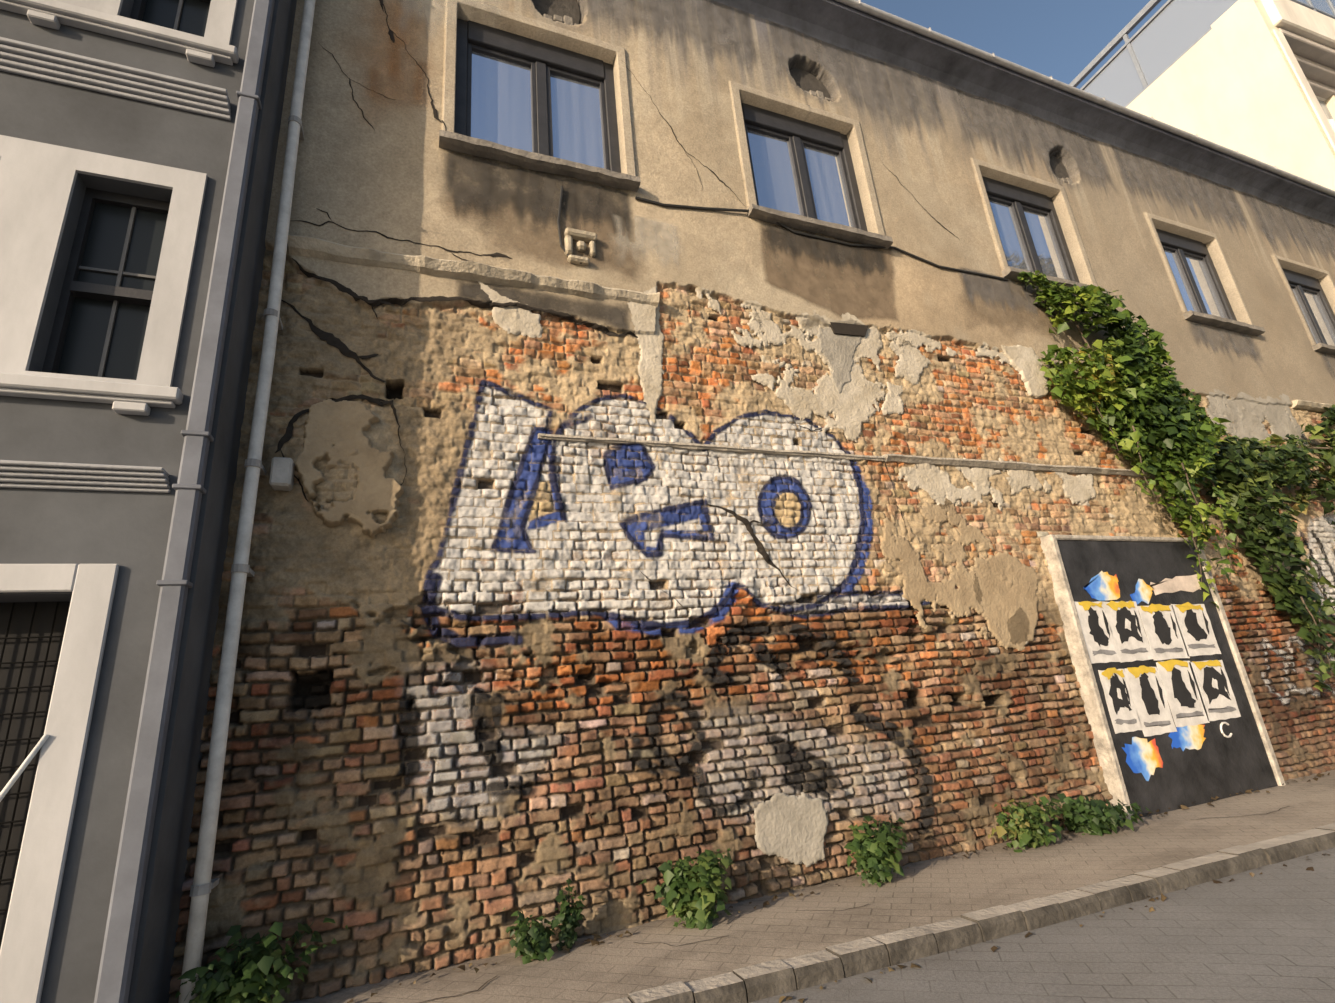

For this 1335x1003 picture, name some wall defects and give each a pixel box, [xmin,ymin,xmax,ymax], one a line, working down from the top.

crack [325,49,395,129]
crack [294,208,512,264]
crack [379,0,446,131]
crack [275,258,638,501]
peeling [478,281,543,338]
peeling [627,286,665,423]
crack [624,62,748,207]
peeling [695,287,722,315]
peeling [731,300,957,442]
crack [879,158,960,240]
peeling [975,341,1049,399]
peeling [880,458,1096,640]